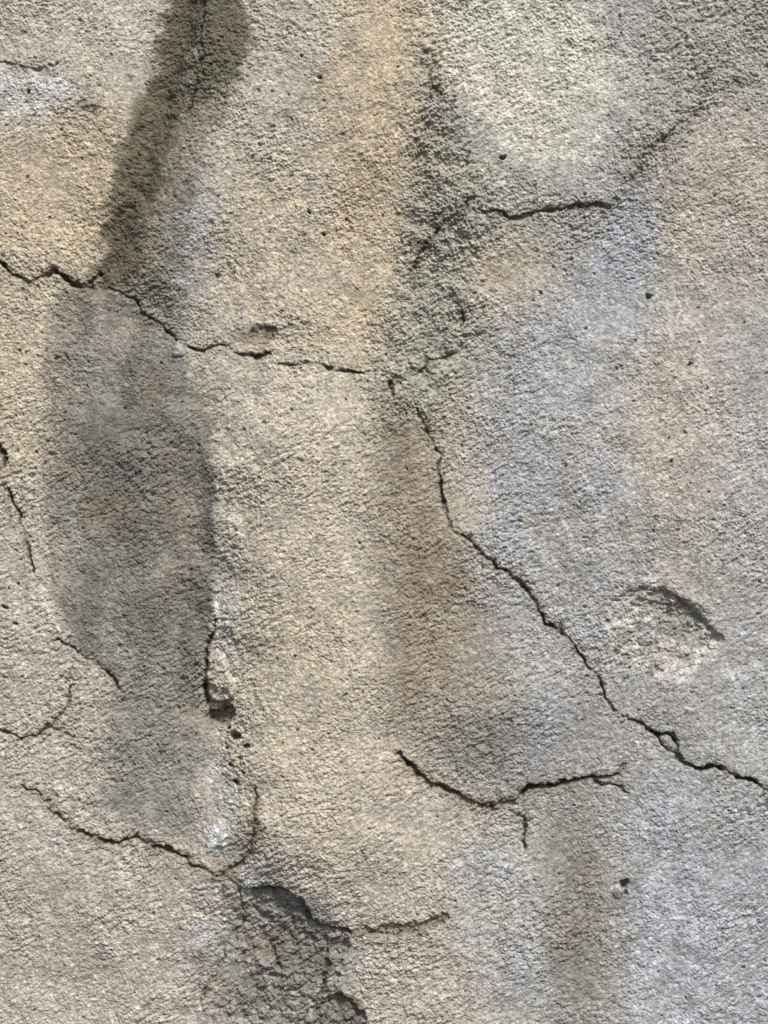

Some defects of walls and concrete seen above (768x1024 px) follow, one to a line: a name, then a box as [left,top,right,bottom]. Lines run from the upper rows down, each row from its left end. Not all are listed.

water stain [0,51,97,130]
water stain [30,56,246,865]
crack [0,43,768,857]
spalling [598,583,728,688]
crack [15,779,265,883]
water stain [183,908,237,965]
spalling [188,882,369,1024]